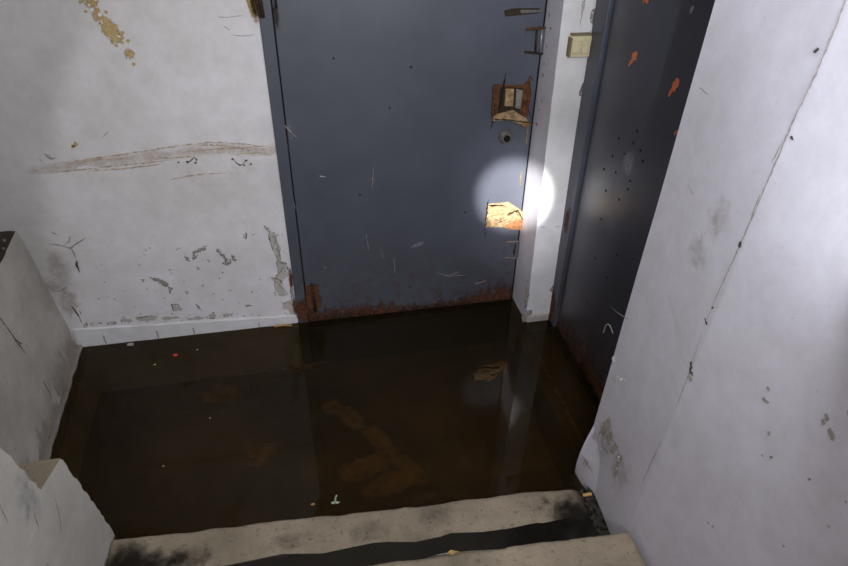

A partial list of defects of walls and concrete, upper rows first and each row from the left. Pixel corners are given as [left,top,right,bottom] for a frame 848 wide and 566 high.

corrosion [246,0,258,22]
crack [51,232,86,323]
flaking render [83,269,233,328]
peeling [176,246,236,279]
flaking render [243,225,297,315]
corrosion [293,283,512,322]
flaking render [592,417,623,476]